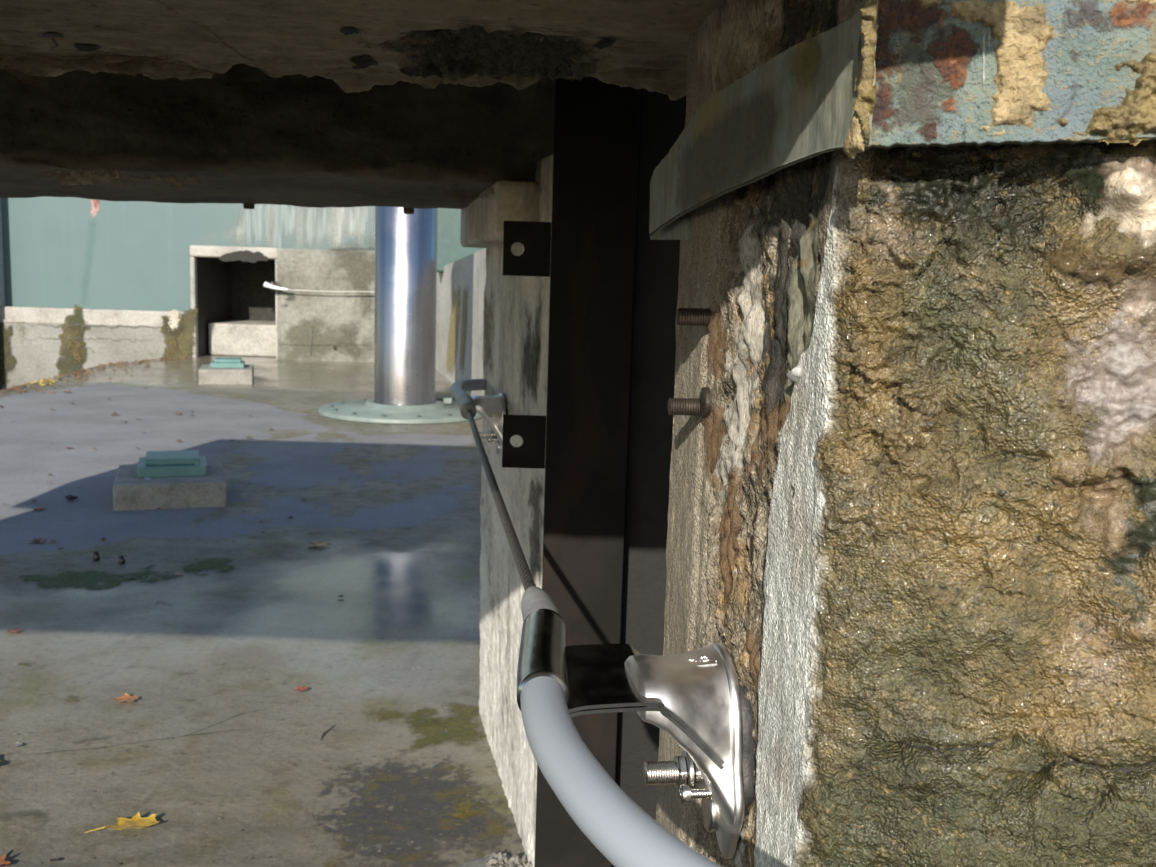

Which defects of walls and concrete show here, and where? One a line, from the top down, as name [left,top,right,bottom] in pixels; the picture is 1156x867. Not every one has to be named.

corrosion [872,0,979,132]
leakage [919,0,1156,146]
corrosion [917,122,938,142]
leakage [166,310,182,355]
leakage [1045,158,1156,460]
leakage [1095,482,1123,547]
crack [880,738,1015,788]
crack [994,761,1156,849]